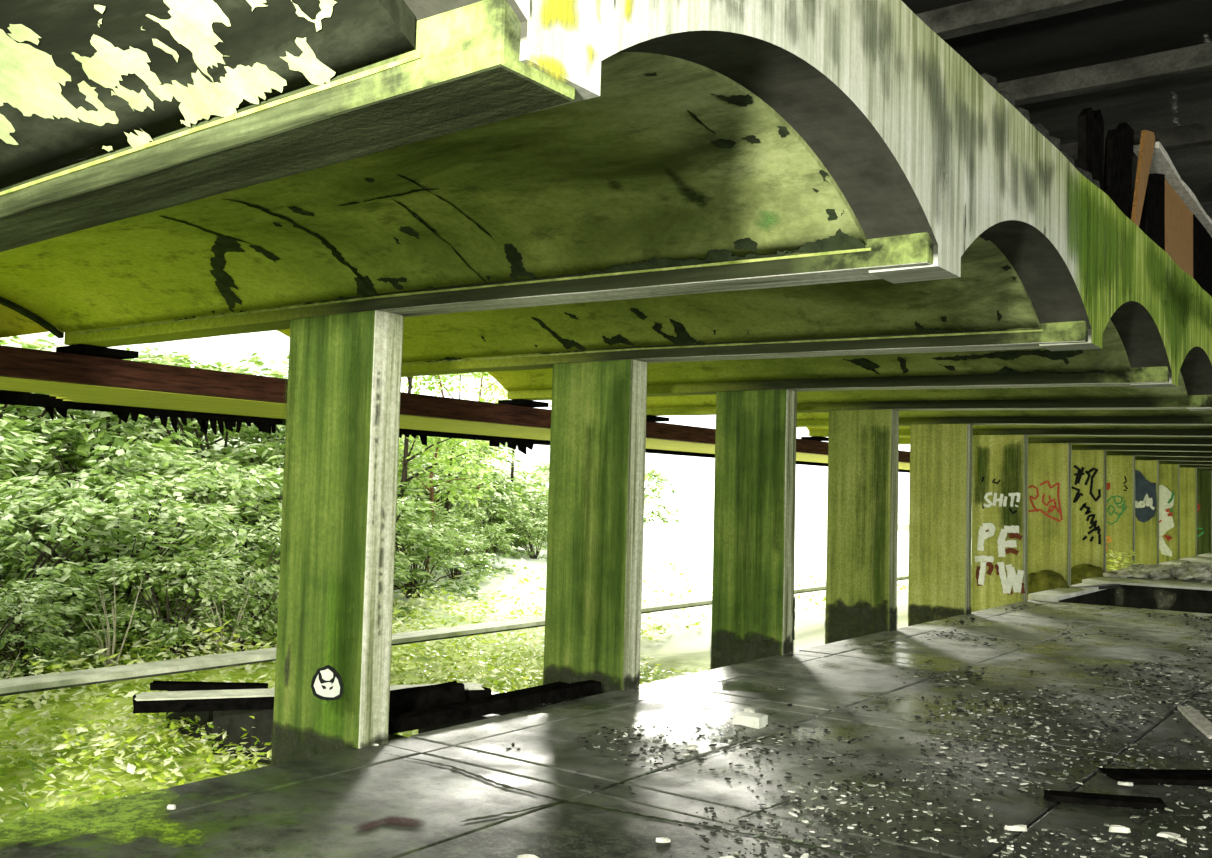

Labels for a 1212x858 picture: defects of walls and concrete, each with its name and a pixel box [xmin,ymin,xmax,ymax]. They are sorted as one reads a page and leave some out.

peeling [0,0,337,148]
crack [687,110,716,135]
water stain [923,55,1008,221]
crack [160,216,251,244]
crack [223,199,378,295]
crack [338,174,492,285]
peeling [577,209,865,276]
water stain [1070,181,1209,359]
peeling [932,349,1105,376]
water stain [710,430,794,669]
water stain [824,427,971,644]
spalling [1059,585,1212,614]